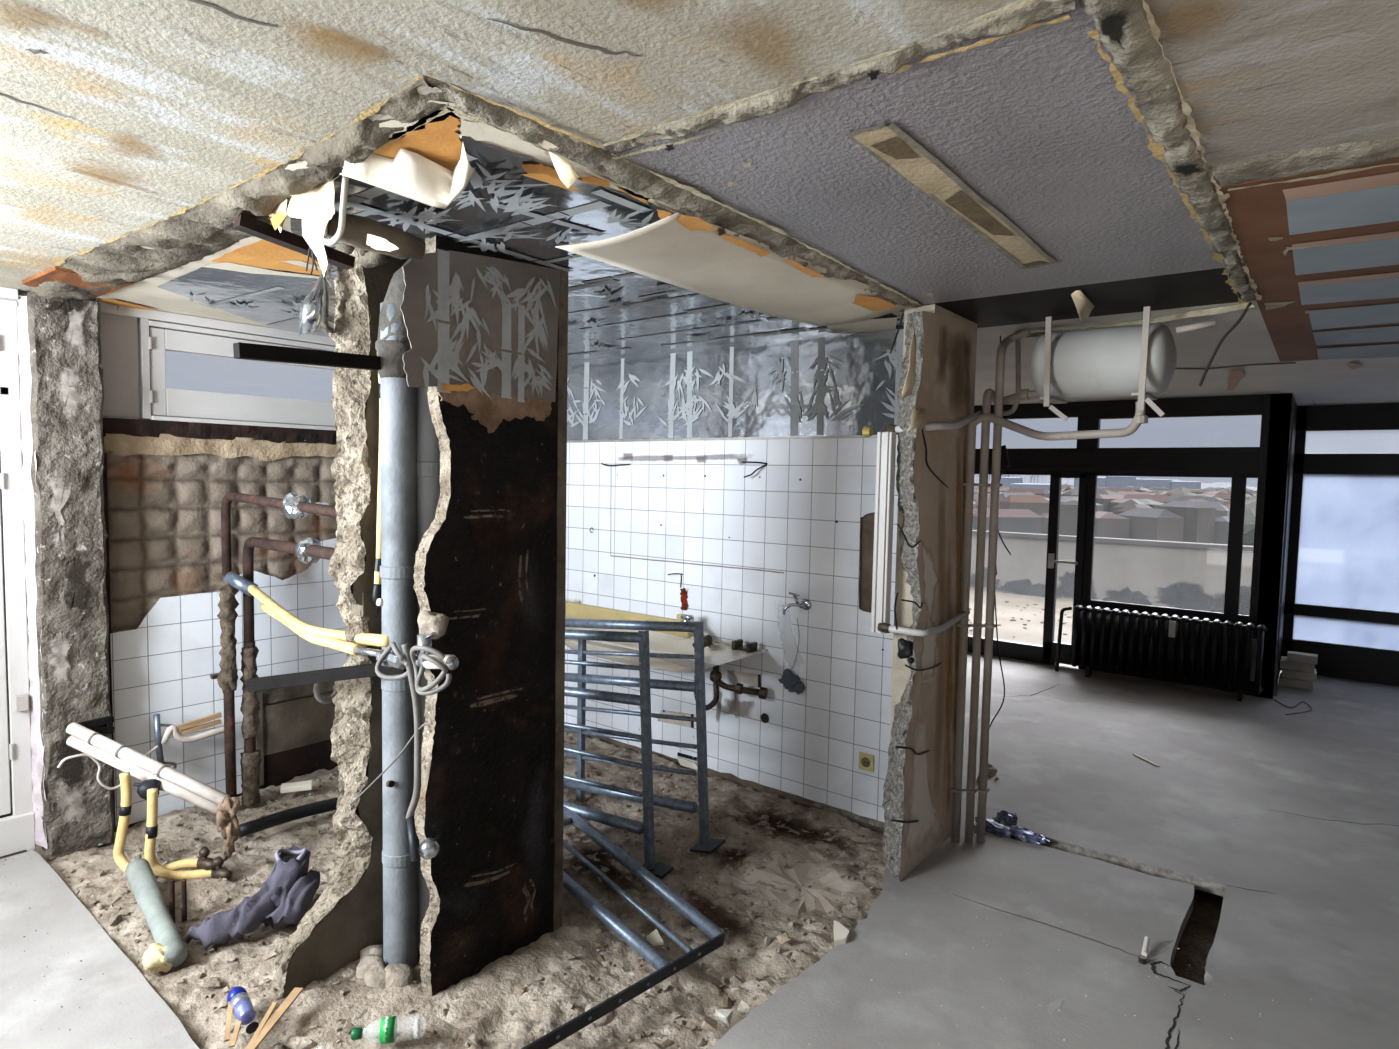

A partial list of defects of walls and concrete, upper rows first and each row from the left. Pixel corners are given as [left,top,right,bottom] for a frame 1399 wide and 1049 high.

peeling [37,74,601,275]
peeling [1088,11,1246,304]
spalling [58,370,80,417]
spalling [65,300,87,353]
flaking render [437,383,552,433]
spalling [49,477,70,545]
spalling [49,636,72,684]
peeling [103,248,373,1000]
spalling [882,293,943,882]
crack [953,894,1190,1049]